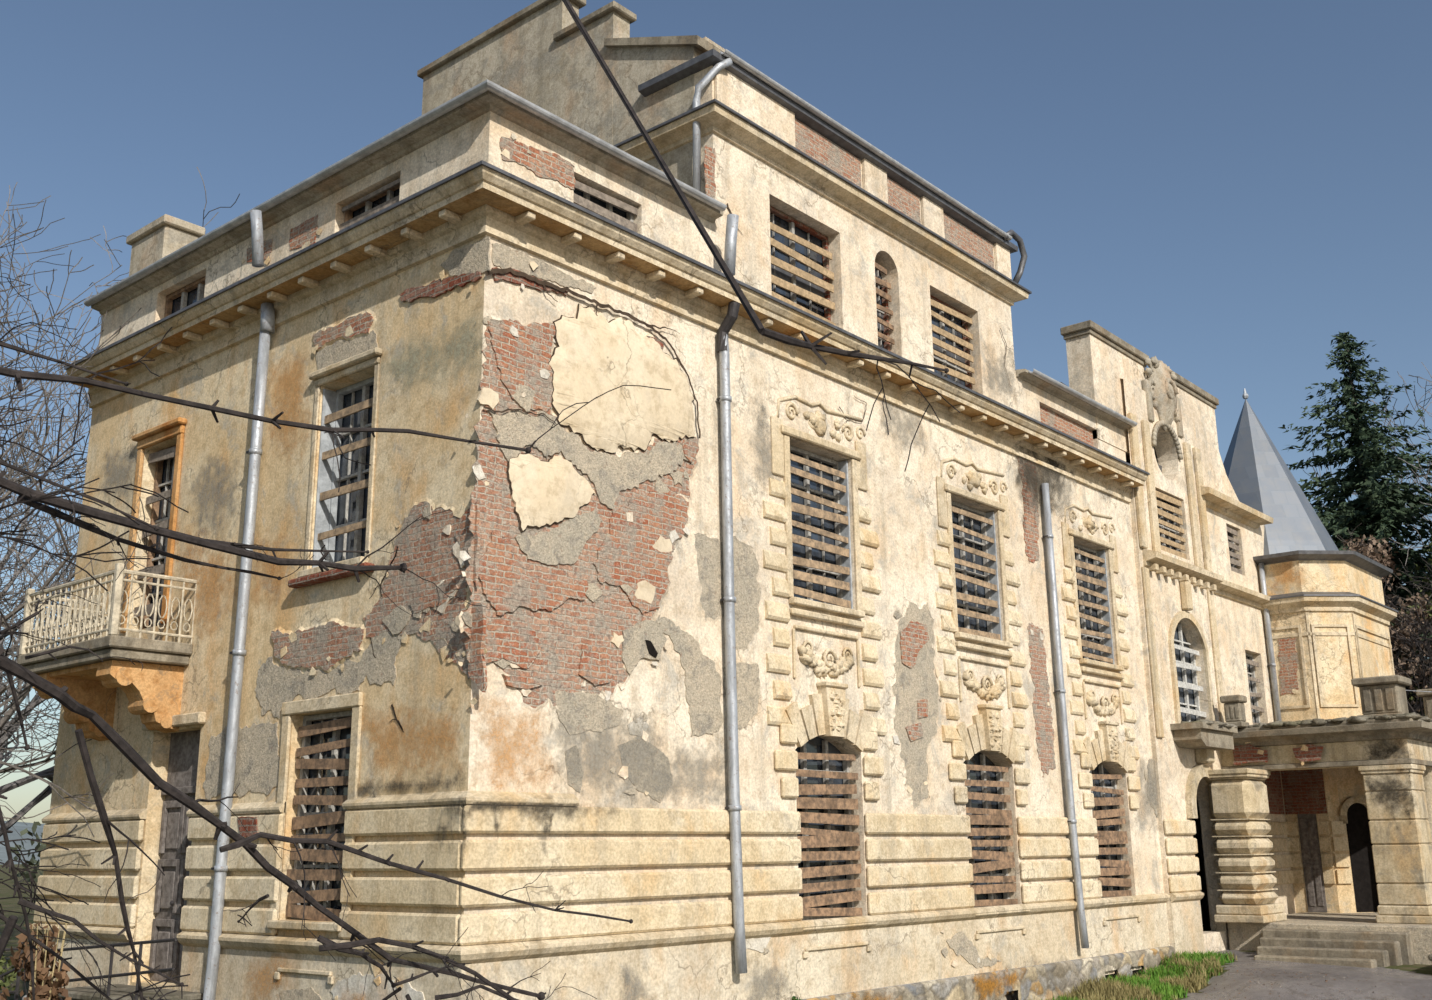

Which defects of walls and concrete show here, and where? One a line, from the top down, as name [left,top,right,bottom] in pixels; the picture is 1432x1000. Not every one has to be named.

flaking render [499,133,576,190]
flaking render [399,261,568,303]
flaking render [312,309,377,355]
spalling [271,316,699,712]
flaking render [1018,457,1040,563]
spalling [890,599,942,812]
spalling [1027,622,1056,777]
flaking render [1278,637,1299,695]
damp [565,719,719,796]